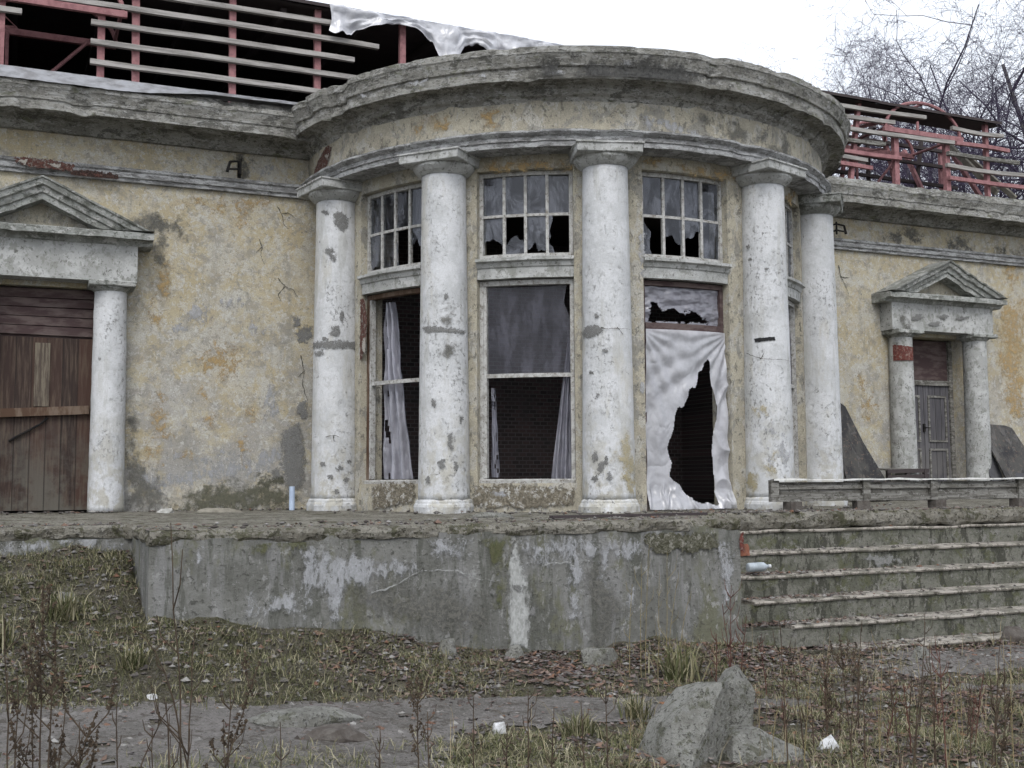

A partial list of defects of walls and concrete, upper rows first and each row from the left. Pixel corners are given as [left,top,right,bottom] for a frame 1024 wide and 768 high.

flaking render [14,156,102,177]
flaking render [314,145,332,174]
spalling [292,311,344,356]
flaking render [893,345,913,361]
leakage [125,416,298,511]
crack [372,562,500,593]
leakage [493,536,641,648]